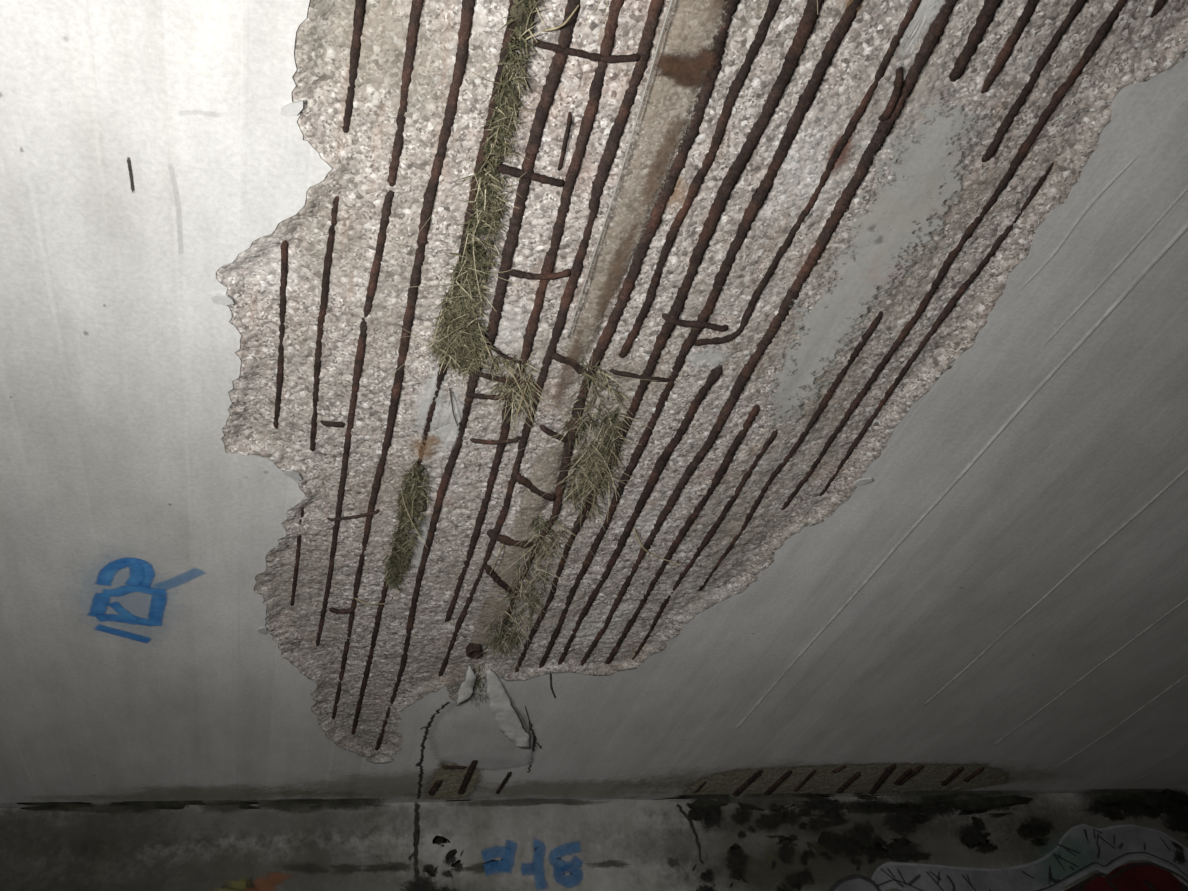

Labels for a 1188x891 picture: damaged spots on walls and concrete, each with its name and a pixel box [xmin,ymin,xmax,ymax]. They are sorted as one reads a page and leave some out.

rust [654,46,716,88]
spalling [211,0,1188,764]
damp [34,800,187,813]
damp [258,798,378,812]
crack [408,702,450,878]
spalling [426,761,483,800]
spalling [683,763,1009,796]
damp [686,790,1052,891]
damp [1084,788,1188,866]